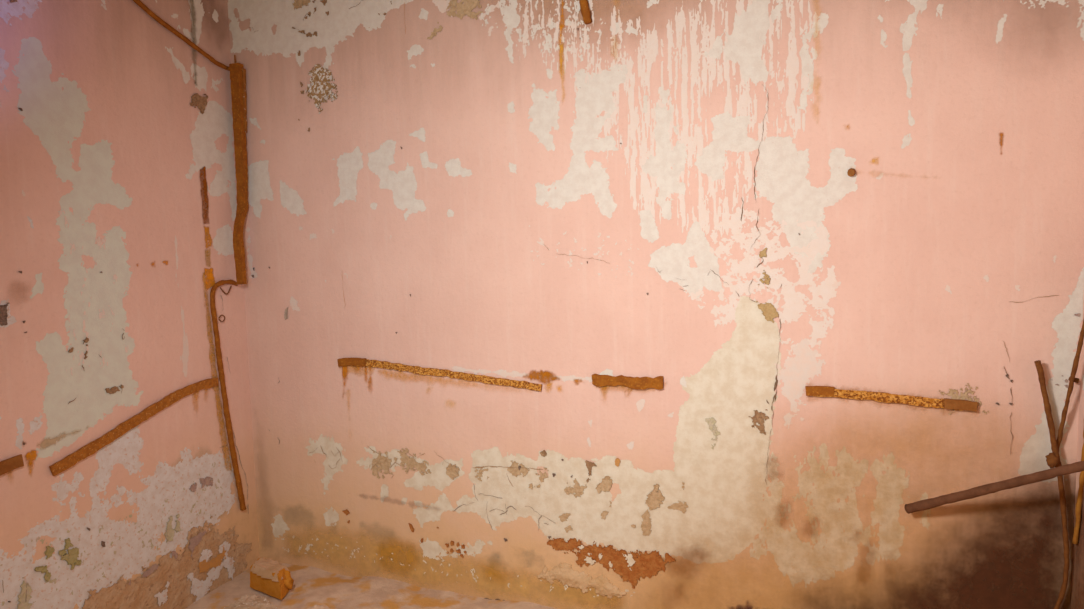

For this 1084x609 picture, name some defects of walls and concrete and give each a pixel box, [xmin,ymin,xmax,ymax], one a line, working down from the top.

peeling [0,0,42,27]
peeling [995,14,1008,44]
peeling [1020,0,1084,41]
peeling [165,0,931,597]
peeling [0,37,252,609]
rust [49,167,232,476]
rust [337,358,560,391]
rust [592,374,663,393]
rust [805,386,978,412]
rust [25,450,37,473]
damp [292,533,612,604]
damp [890,495,1084,609]